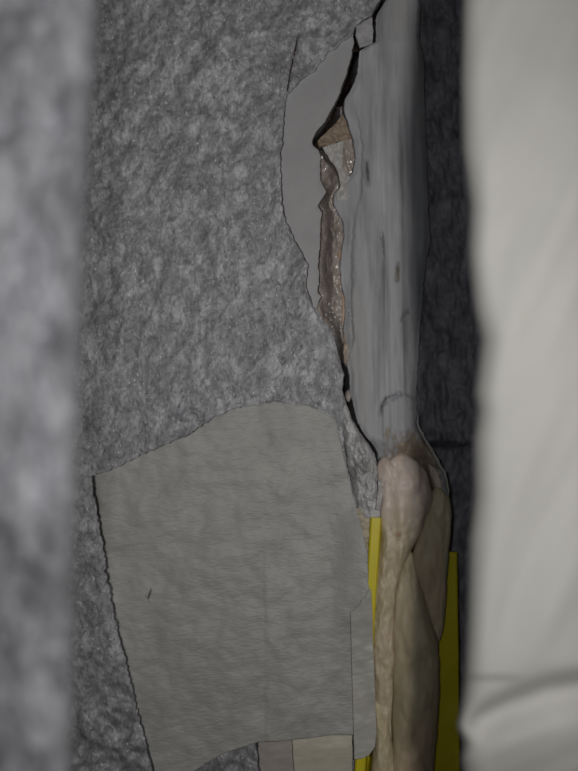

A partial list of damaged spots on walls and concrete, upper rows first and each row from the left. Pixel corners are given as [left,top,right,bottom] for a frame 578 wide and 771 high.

flaking render [280,17,373,314]